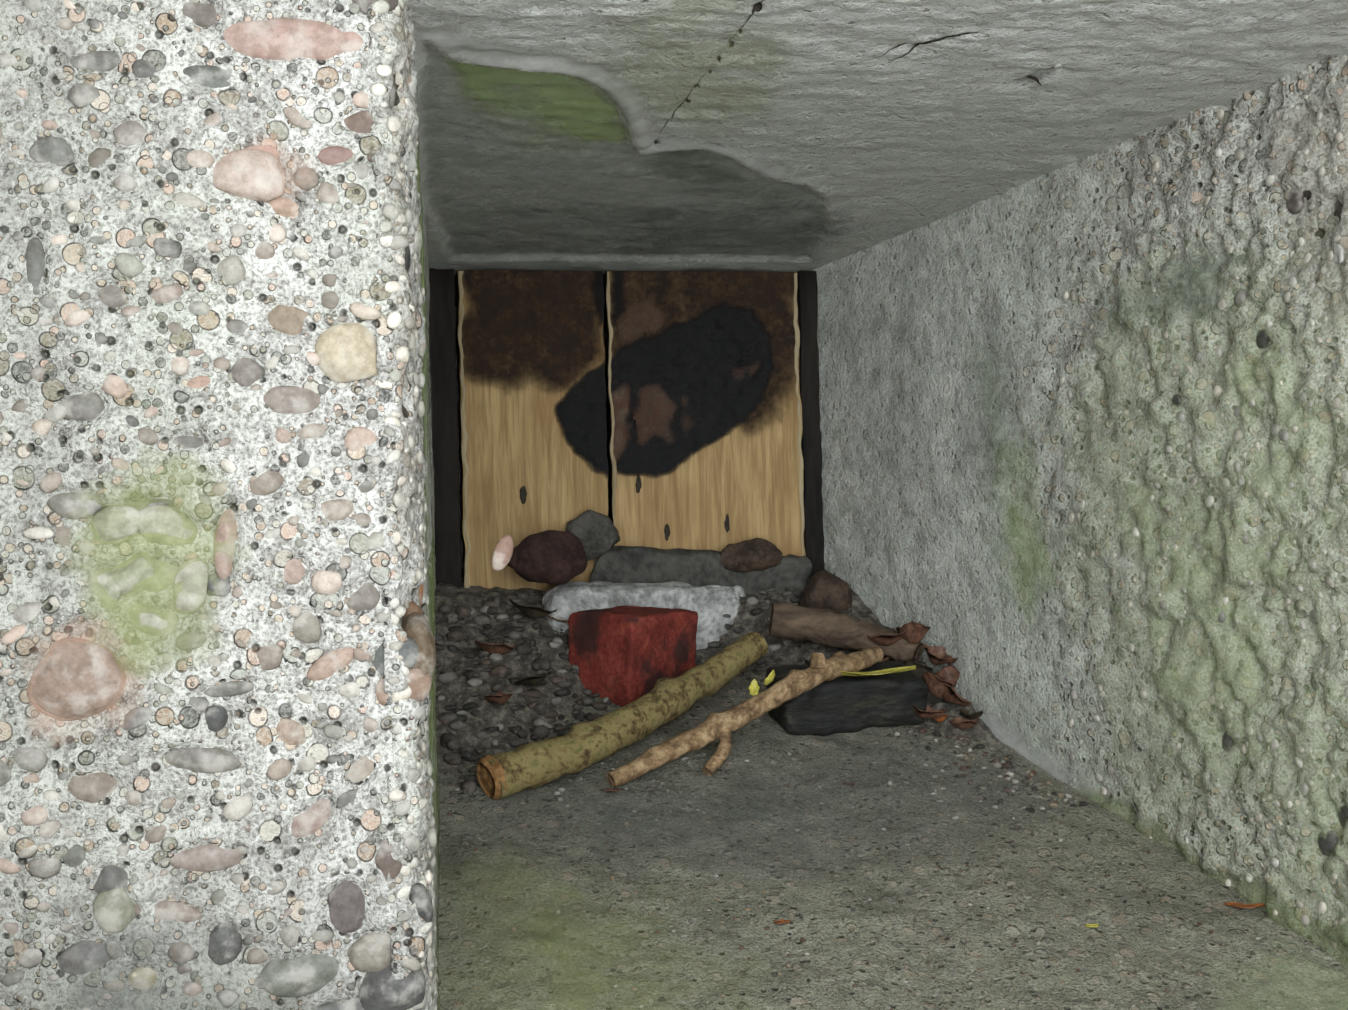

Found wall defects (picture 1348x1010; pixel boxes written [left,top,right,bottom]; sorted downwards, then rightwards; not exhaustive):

leakage [420,18,791,179]
crack [653,0,764,145]
crack [421,545,432,615]